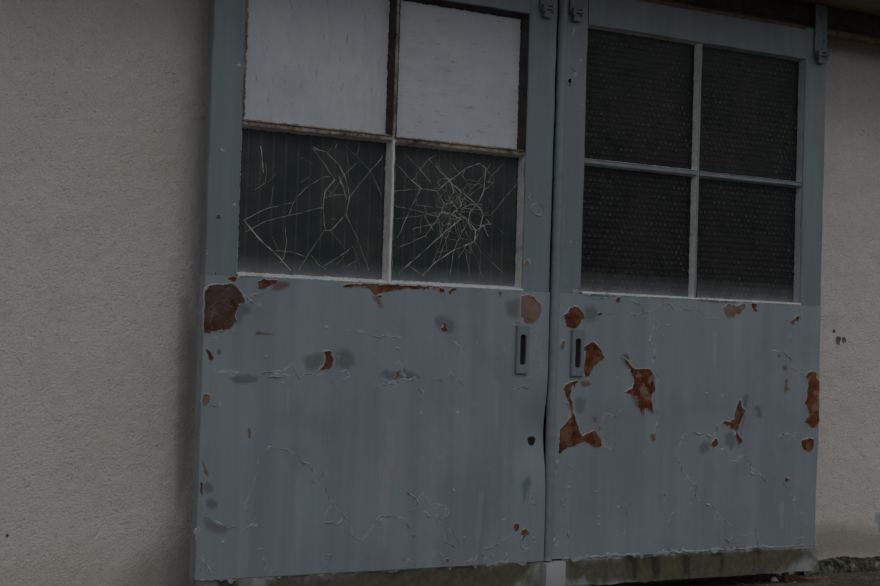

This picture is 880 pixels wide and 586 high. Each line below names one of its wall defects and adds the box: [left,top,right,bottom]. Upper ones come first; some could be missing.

peeling [342,282,457,299]
peeling [318,349,335,372]